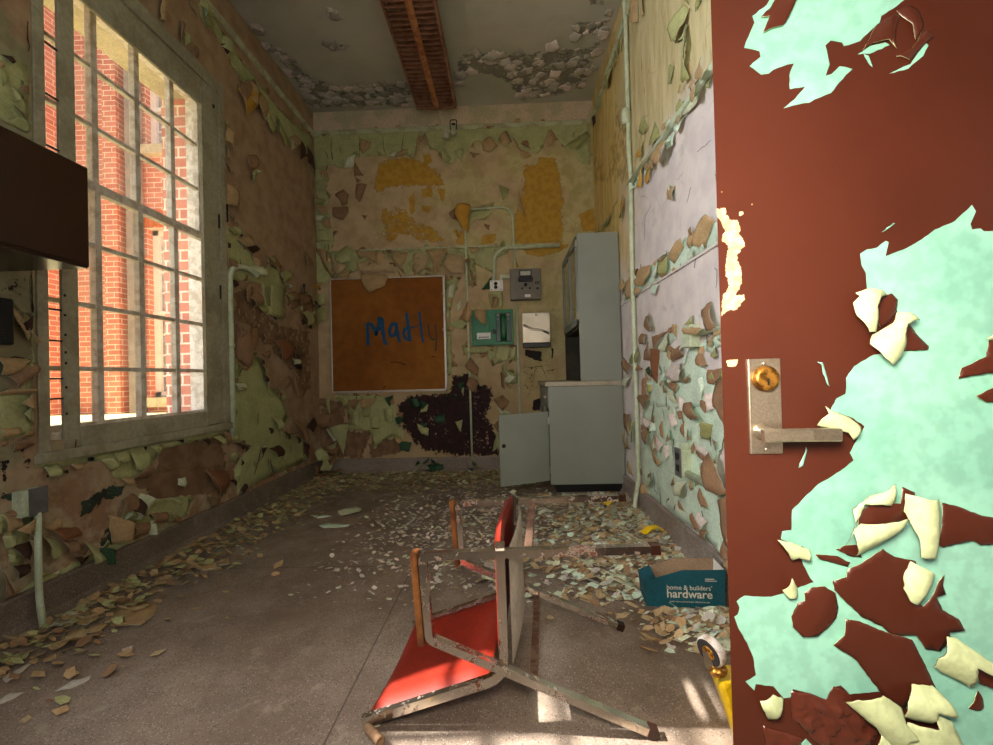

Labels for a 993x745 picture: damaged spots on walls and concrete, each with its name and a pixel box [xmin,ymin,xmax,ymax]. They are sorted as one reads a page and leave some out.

peeling [0,0,635,600]
peeling [592,574,640,602]
peeling [579,0,713,232]
peeling [618,204,753,574]
peeling [673,205,993,745]
peeling [744,0,934,108]